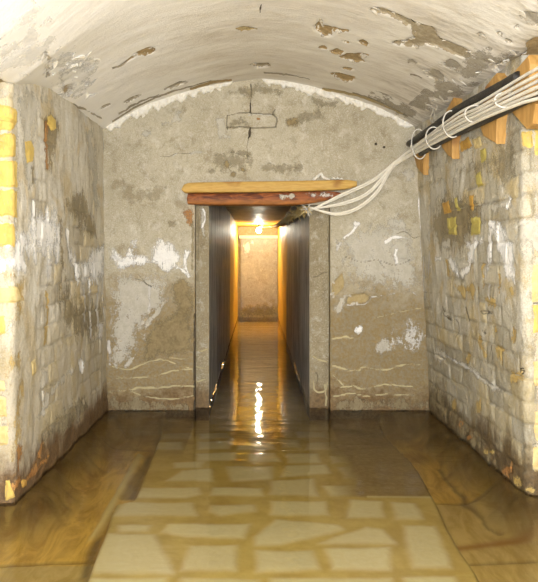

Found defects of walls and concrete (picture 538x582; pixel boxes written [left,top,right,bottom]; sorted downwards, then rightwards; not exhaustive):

peeling [41,51,101,101]
flaking render [123,47,155,63]
peeling [262,7,538,128]
leakage [64,129,104,238]
leakage [427,179,538,284]
leakage [0,200,205,374]